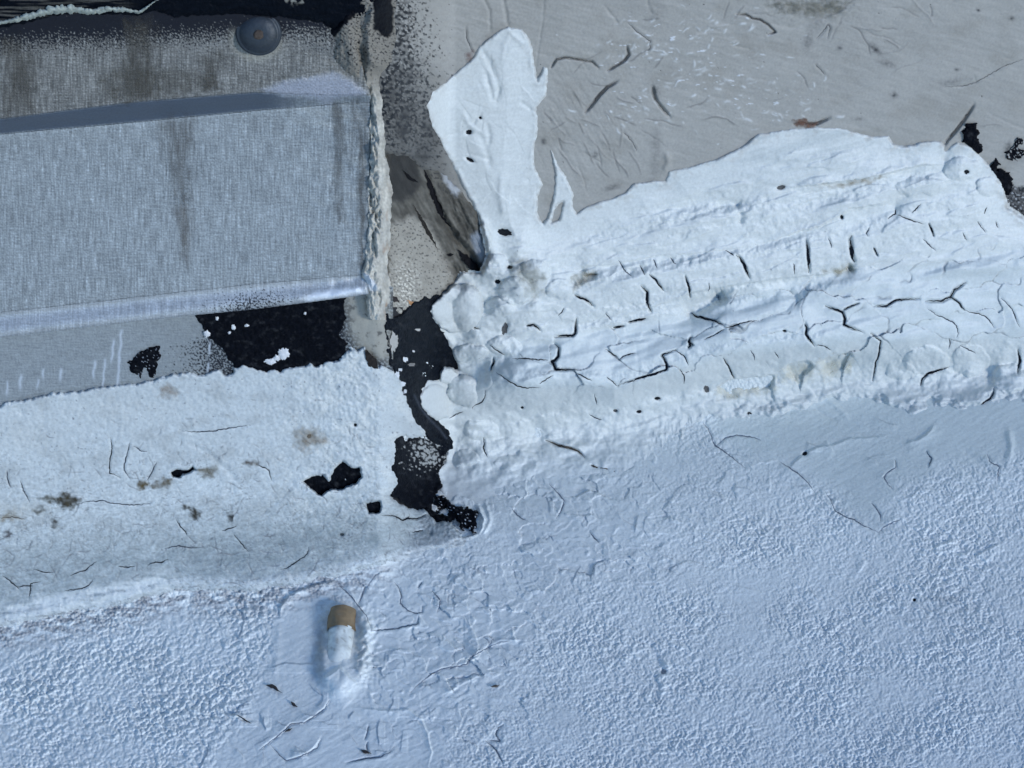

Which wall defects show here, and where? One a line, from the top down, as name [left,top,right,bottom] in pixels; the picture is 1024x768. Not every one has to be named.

peeling [944,105,983,154]
peeling [990,137,1024,195]
crack [794,205,935,274]
peeling [127,346,161,378]
peeling [195,297,348,372]
crack [450,257,757,420]
crack [826,283,1020,383]
peeling [367,294,478,534]
crack [78,440,157,506]
peeling [303,462,361,495]
crack [3,522,200,596]
crack [340,583,441,631]